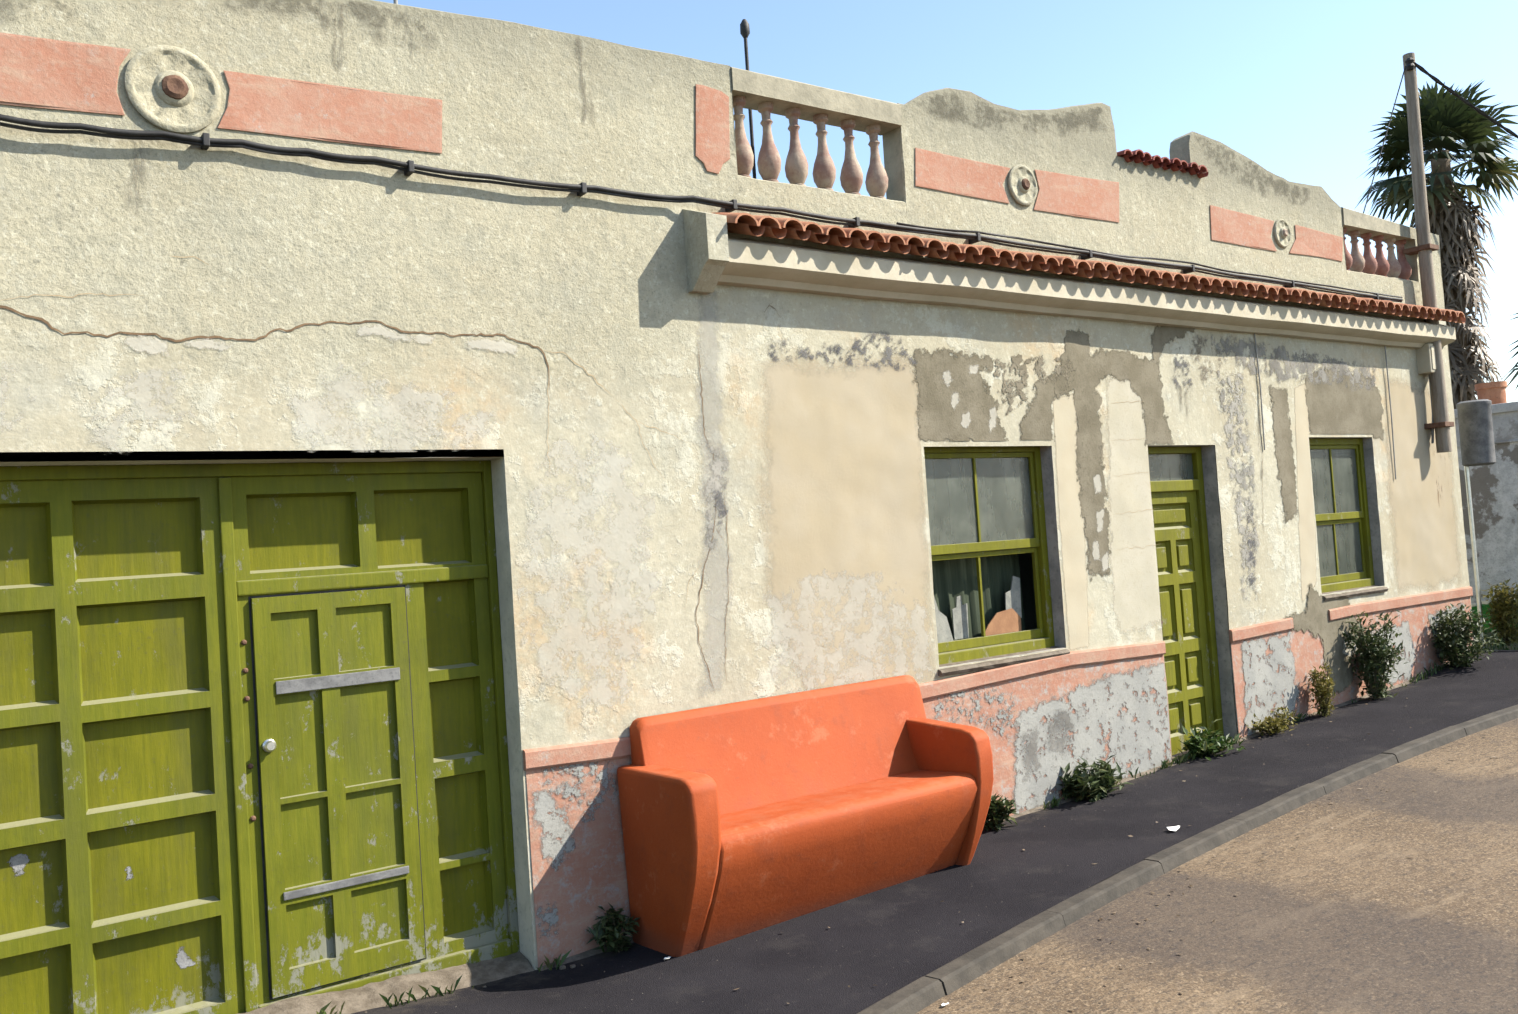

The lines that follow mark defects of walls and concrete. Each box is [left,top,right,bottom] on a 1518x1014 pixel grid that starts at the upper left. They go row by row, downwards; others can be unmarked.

crack [0,293,729,692]
spalling [912,325,1195,581]
spalling [1269,368,1384,524]
peeling [1241,583,1415,735]
peeling [1428,602,1465,658]
peeling [934,663,1171,814]
peeling [533,761,617,870]